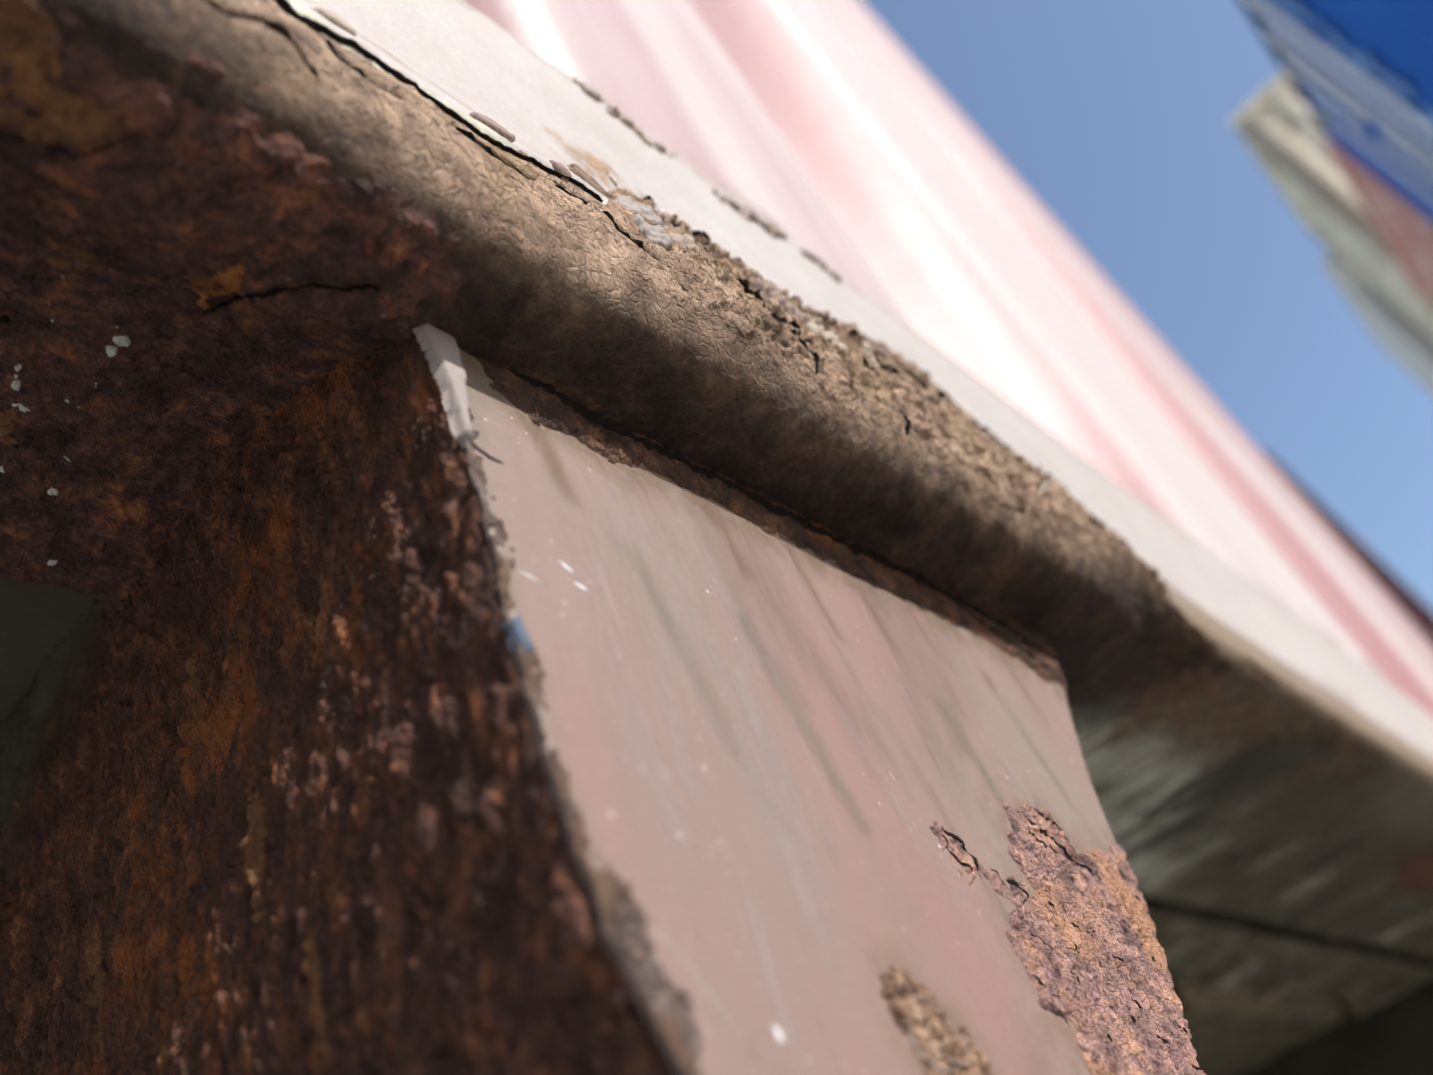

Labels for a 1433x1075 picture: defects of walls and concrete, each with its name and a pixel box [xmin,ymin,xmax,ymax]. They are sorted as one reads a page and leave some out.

peeling [309,6,357,37]
crack [202,0,695,260]
peeling [469,112,515,142]
peeling [572,76,678,158]
peeling [712,188,843,283]
crack [753,283,820,374]
corrosion [0,0,659,1075]
corrosion [880,966,992,1075]